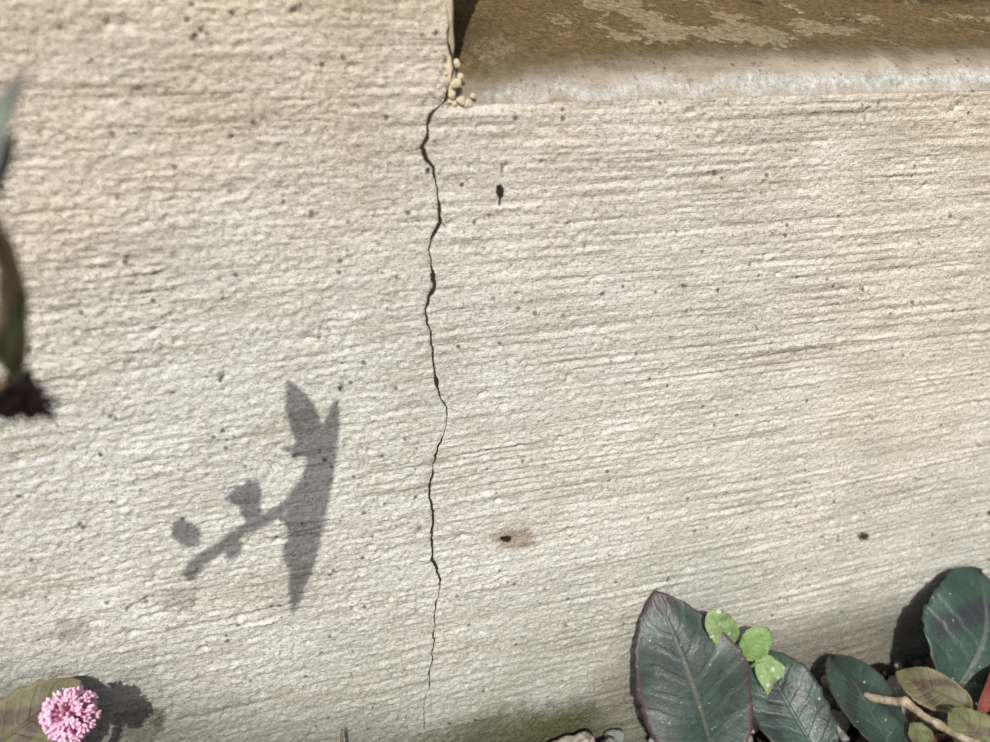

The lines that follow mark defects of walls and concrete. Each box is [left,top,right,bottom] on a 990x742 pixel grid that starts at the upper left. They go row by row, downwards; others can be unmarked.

peeling [543,0,885,51]
water stain [446,0,990,82]
peeling [910,12,990,24]
crack [411,1,456,726]